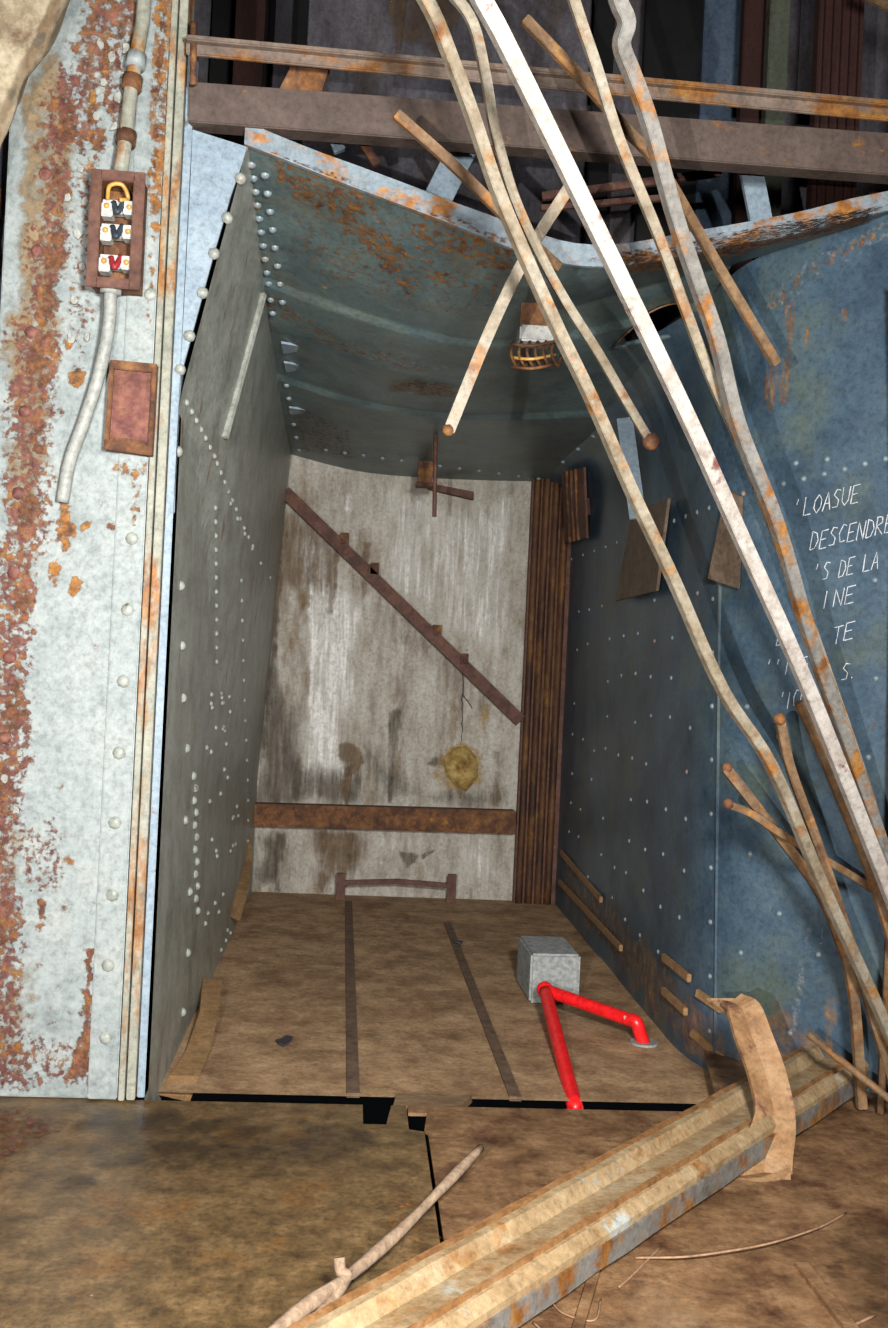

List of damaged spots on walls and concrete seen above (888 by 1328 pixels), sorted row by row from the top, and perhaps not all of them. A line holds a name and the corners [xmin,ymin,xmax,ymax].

corrosion [147,0,175,289]
corrosion [270,152,518,309]
corrosion [620,247,682,273]
corrosion [693,204,888,264]
corrosion [113,463,146,526]
corrosion [0,0,136,1092]
leakage [389,710,400,737]
leakage [261,834,285,881]
leakage [318,830,360,886]